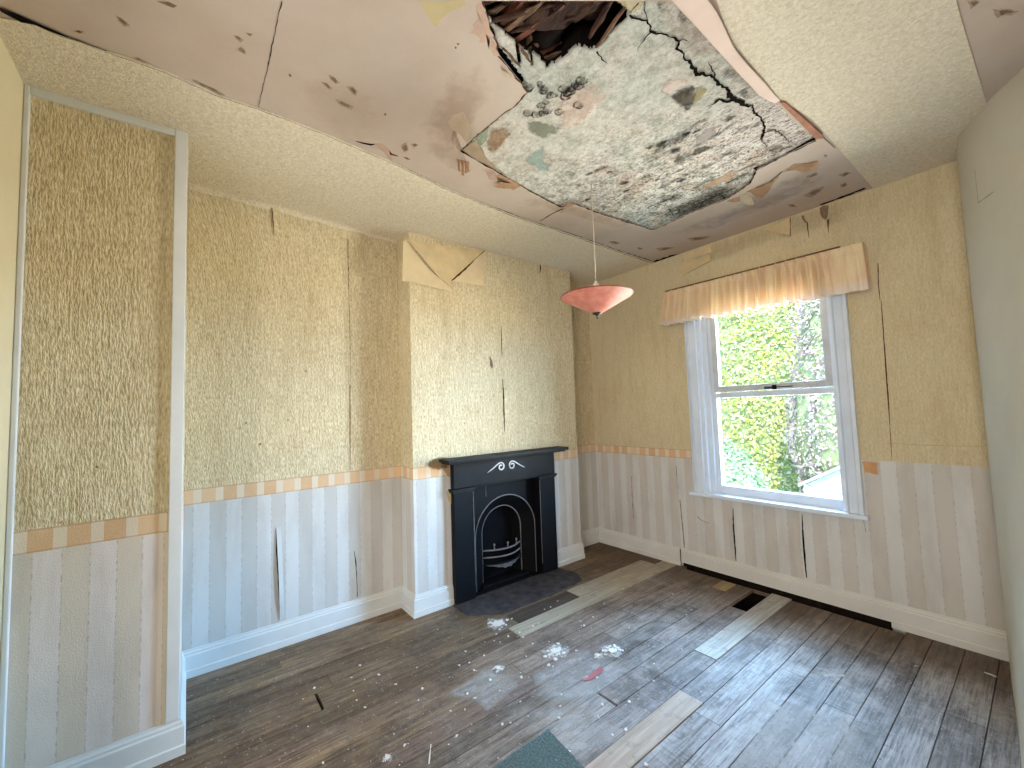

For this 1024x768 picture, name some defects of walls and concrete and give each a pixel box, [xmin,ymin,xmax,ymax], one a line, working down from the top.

crack [258,1,282,106]
peeling [321,74,358,110]
flaking render [461,1,827,230]
crack [629,1,790,149]
peeling [992,9,1019,18]